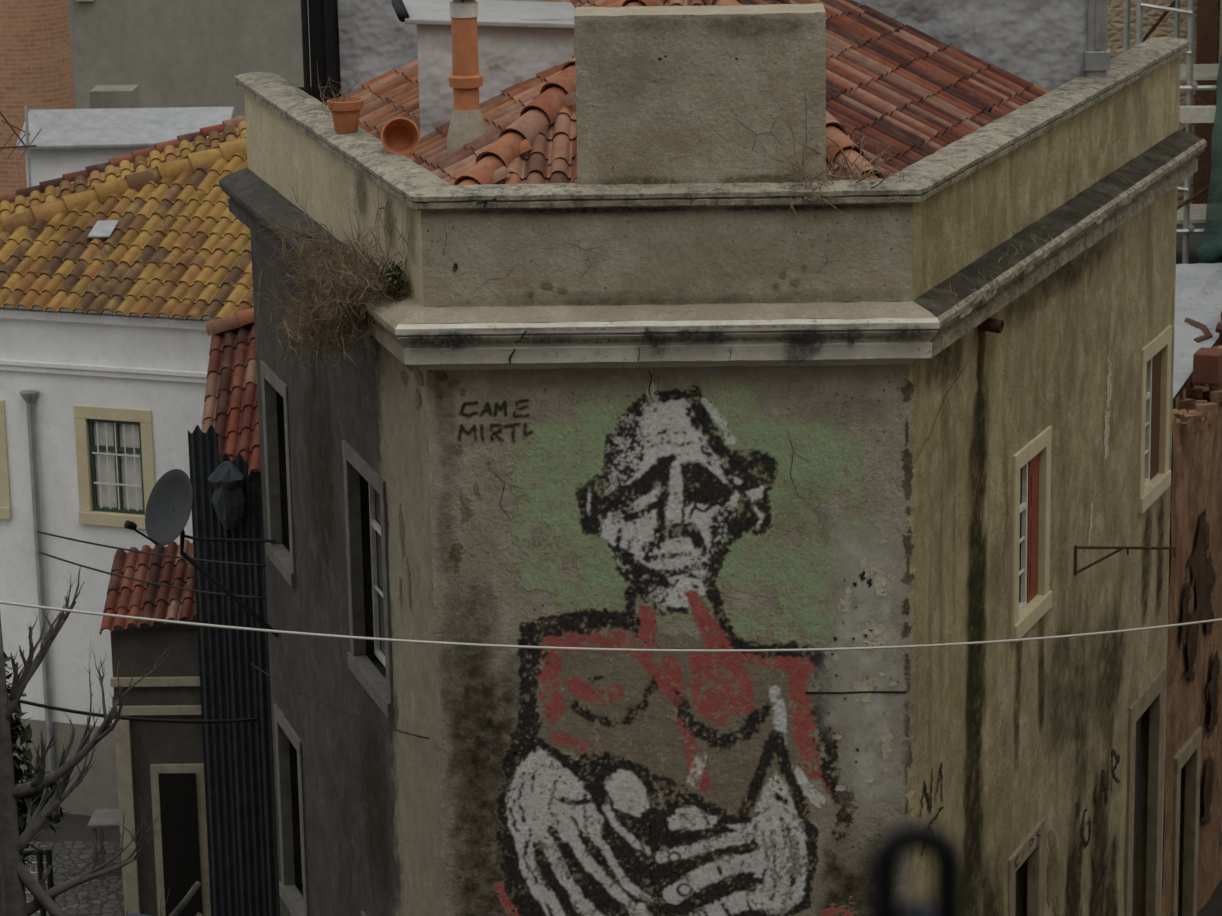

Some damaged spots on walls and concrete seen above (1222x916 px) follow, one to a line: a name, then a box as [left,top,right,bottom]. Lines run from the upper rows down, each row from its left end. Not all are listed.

damp [409,331,488,350]
damp [502,325,928,364]
spalling [901,379,914,403]
peeling [837,421,915,818]
damp [964,330,987,916]